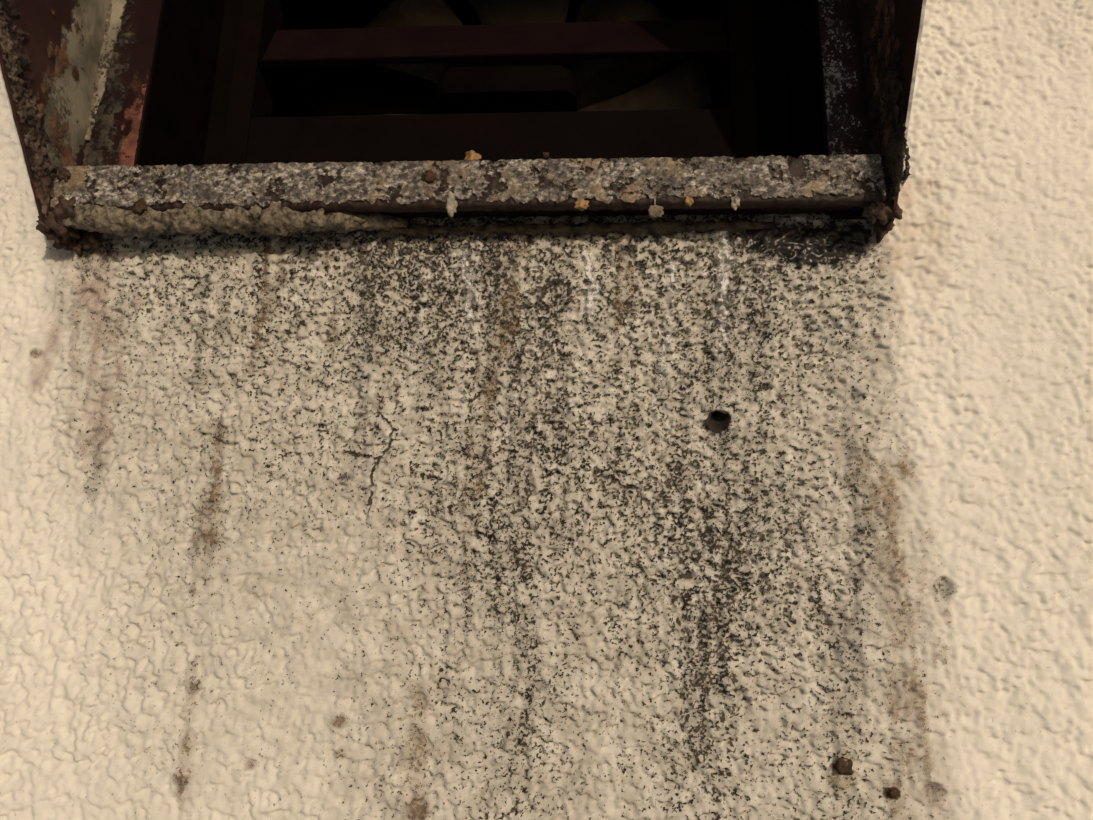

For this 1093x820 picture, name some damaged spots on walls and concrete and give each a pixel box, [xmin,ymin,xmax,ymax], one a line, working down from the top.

rust [33,0,887,207]
rust [245,234,295,368]
rust [193,422,225,591]
crack [343,412,394,512]
damp [42,213,948,820]
rust [853,448,951,786]
rust [173,656,201,802]